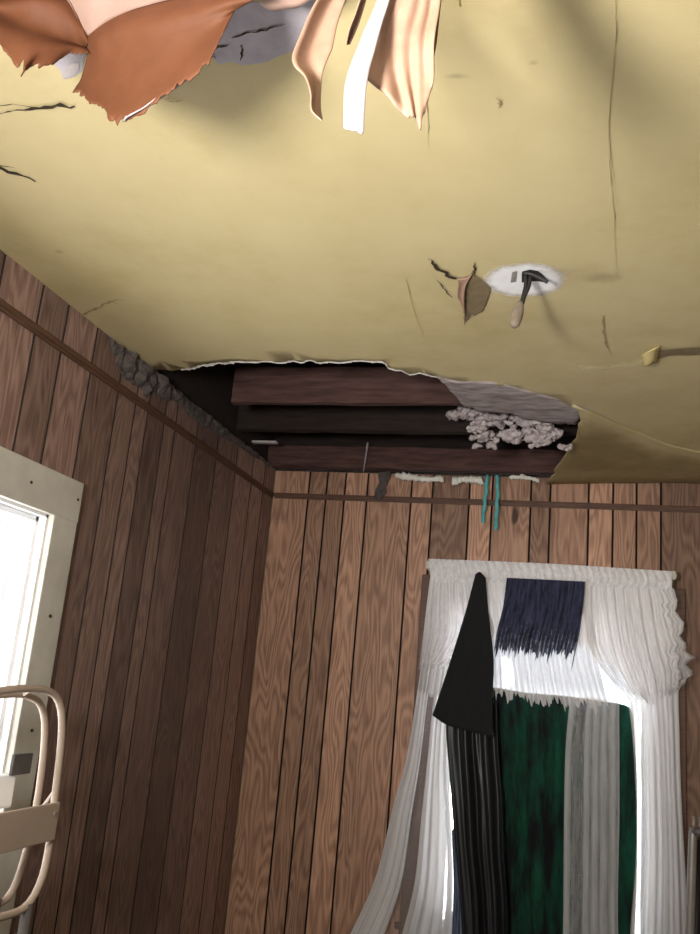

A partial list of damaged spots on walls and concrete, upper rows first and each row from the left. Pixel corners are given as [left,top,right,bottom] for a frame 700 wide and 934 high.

crack [0,103,75,114]
peeling [0,0,346,126]
peeling [343,0,442,135]
crack [0,165,36,182]
spalling [106,337,271,468]